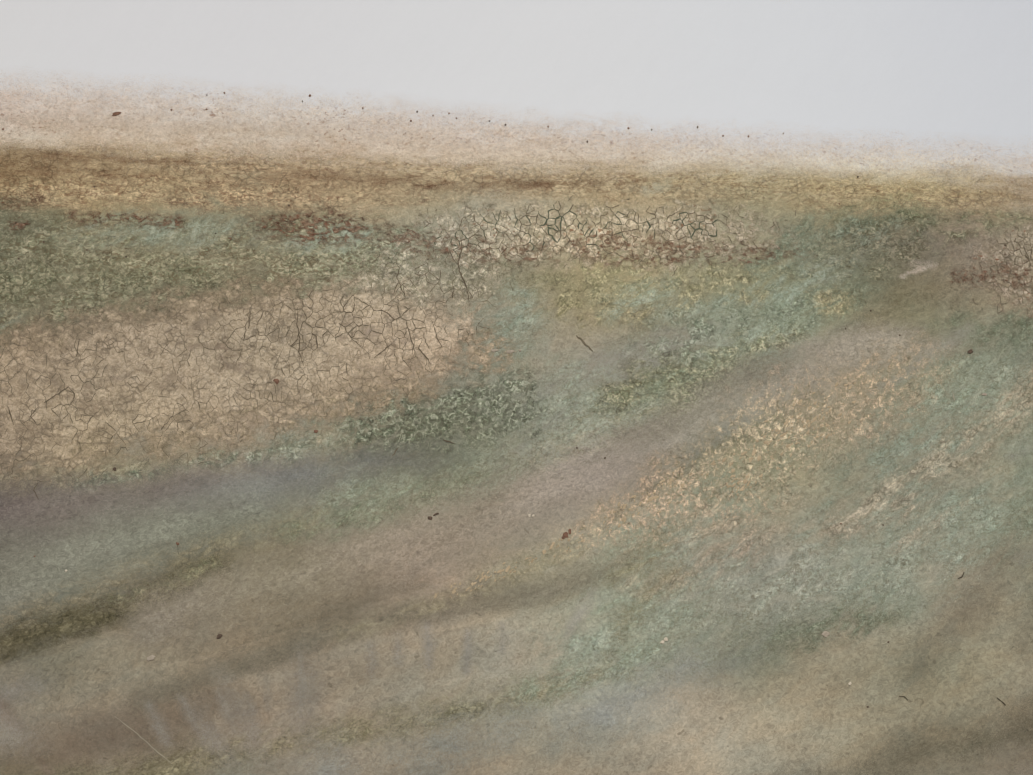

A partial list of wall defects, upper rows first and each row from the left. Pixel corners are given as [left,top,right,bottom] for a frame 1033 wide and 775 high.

crack [0,195,799,500]
crack [950,215,1033,320]